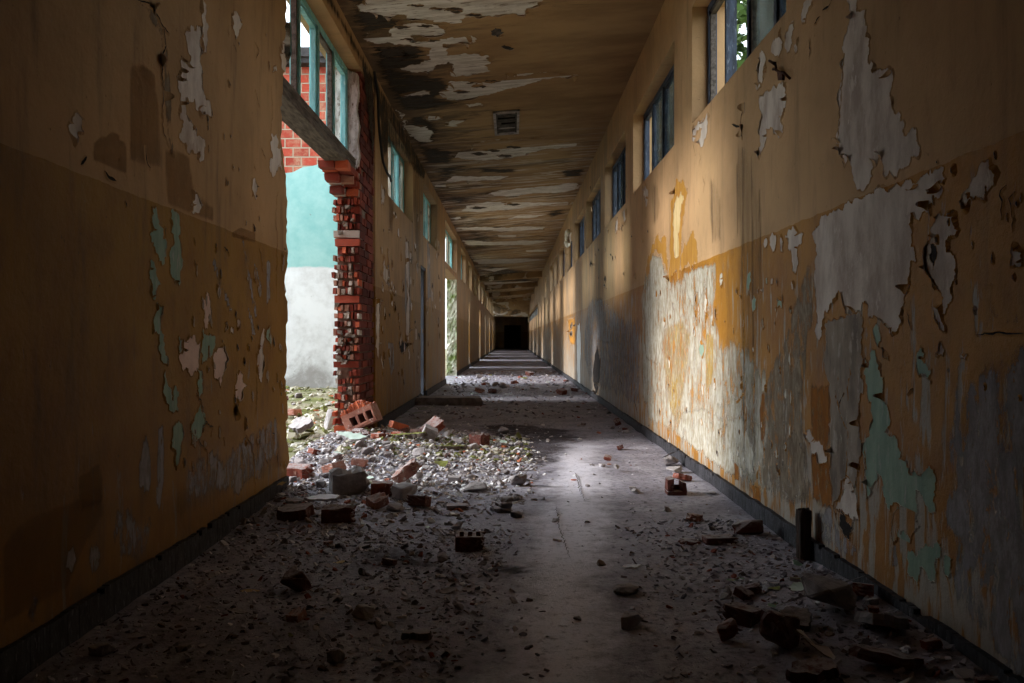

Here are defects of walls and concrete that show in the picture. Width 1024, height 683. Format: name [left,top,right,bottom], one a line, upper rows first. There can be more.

crack [138,0,175,171]
peeling [164,0,213,163]
peeling [148,188,286,472]
spalling [318,160,360,198]
damp [327,0,468,181]
peeling [375,183,441,385]
peeling [354,0,579,142]
peeling [433,176,591,285]
peeling [452,137,577,161]
peeling [607,0,1001,545]